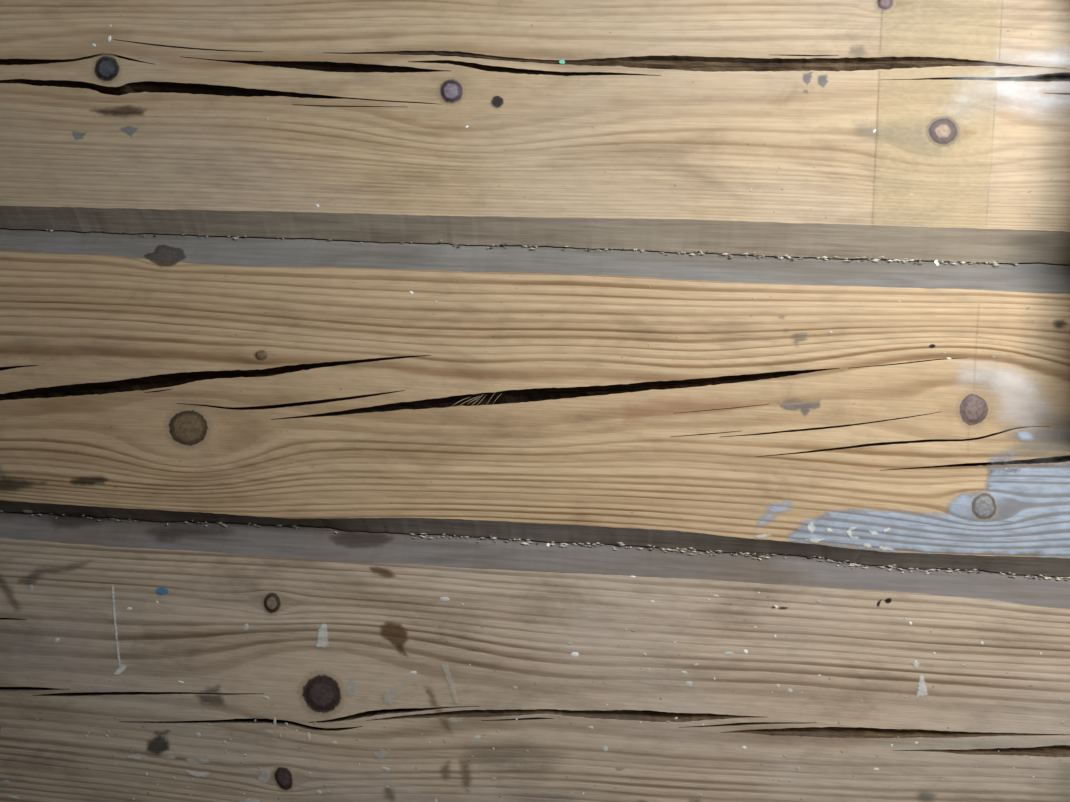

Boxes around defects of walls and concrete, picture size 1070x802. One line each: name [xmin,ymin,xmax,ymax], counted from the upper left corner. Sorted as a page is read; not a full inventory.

crack [0,39,1070,107]
crack [0,355,1070,471]
crack [0,687,1070,757]